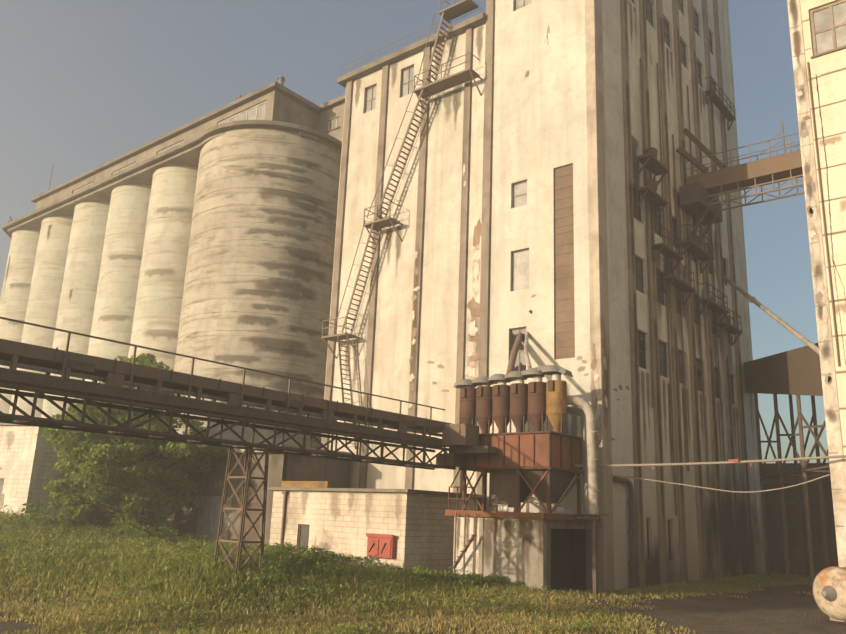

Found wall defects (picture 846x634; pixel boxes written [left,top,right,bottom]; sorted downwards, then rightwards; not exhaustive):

damp [250,158,317,182]
damp [217,338,324,394]
damp [238,189,337,325]
flaking render [409,251,420,363]
flaking render [465,218,482,379]
flaking render [576,337,629,459]